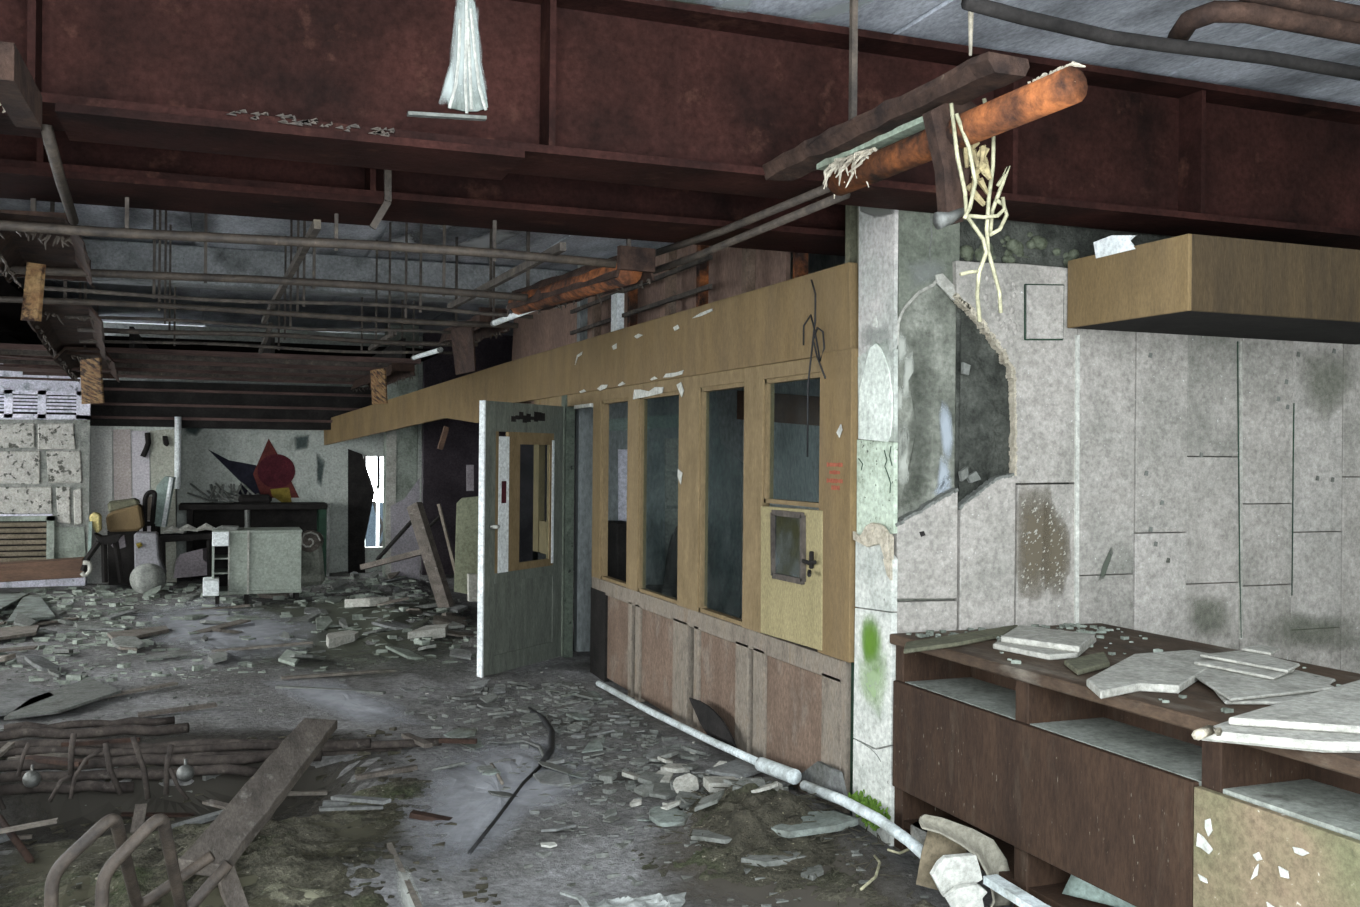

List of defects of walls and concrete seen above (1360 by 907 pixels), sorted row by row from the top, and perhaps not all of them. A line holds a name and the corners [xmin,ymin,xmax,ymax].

peeling [579,370,684,399]
flaking render [853,210,1018,580]
water stain [1019,496,1069,593]